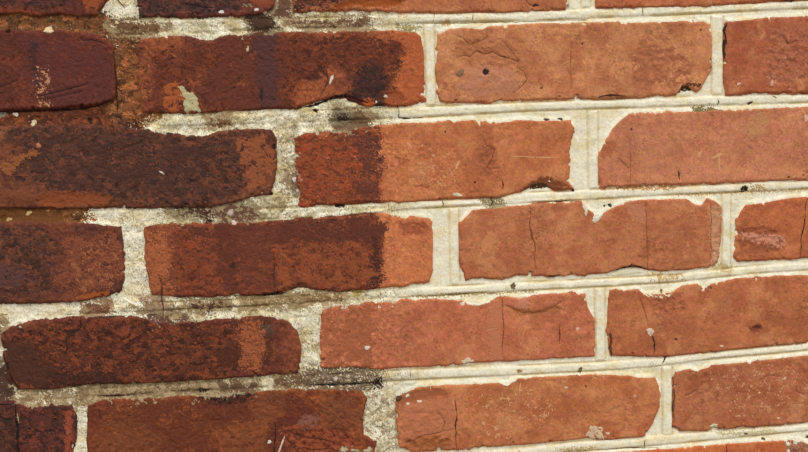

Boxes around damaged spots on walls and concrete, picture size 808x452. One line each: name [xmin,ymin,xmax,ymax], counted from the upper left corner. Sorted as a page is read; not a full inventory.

water stain [323,101,382,141]
spalling [734,226,787,257]
spalling [784,441,808,452]